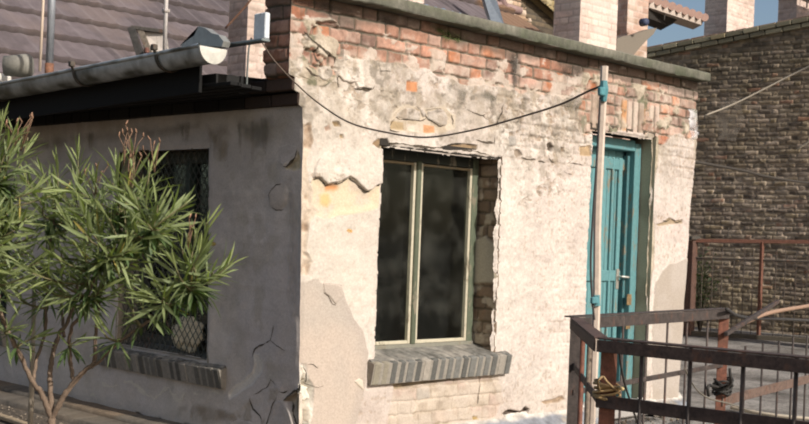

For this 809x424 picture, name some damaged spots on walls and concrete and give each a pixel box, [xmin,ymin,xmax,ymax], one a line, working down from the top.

flaking render [263,0,698,296]
crack [249,364,322,424]
flaking render [386,375,530,424]